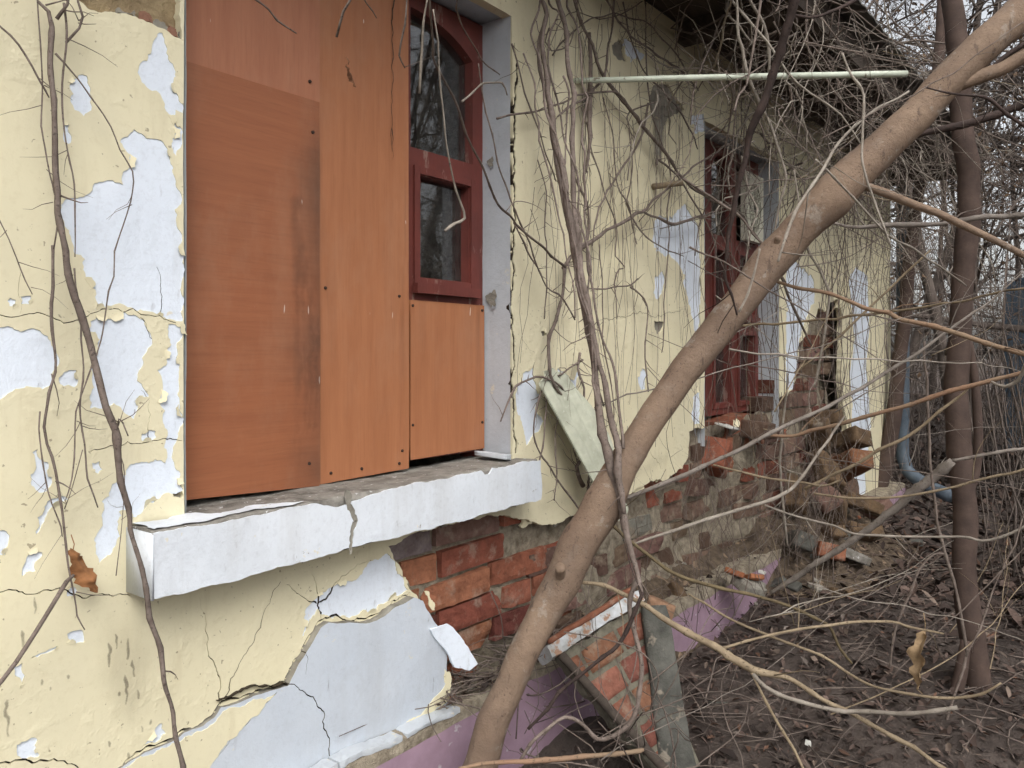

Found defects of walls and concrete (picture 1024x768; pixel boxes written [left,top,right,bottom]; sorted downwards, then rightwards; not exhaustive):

peeling [61,0,187,562]
peeling [652,204,701,331]
peeling [0,326,78,399]
spalling [550,262,871,637]
peeling [22,547,42,575]
peeling [31,450,67,534]
crack [1,587,128,598]
crack [344,490,358,554]
spalling [303,515,574,682]
crack [208,583,404,738]
crack [0,758,78,768]
crack [135,729,183,753]